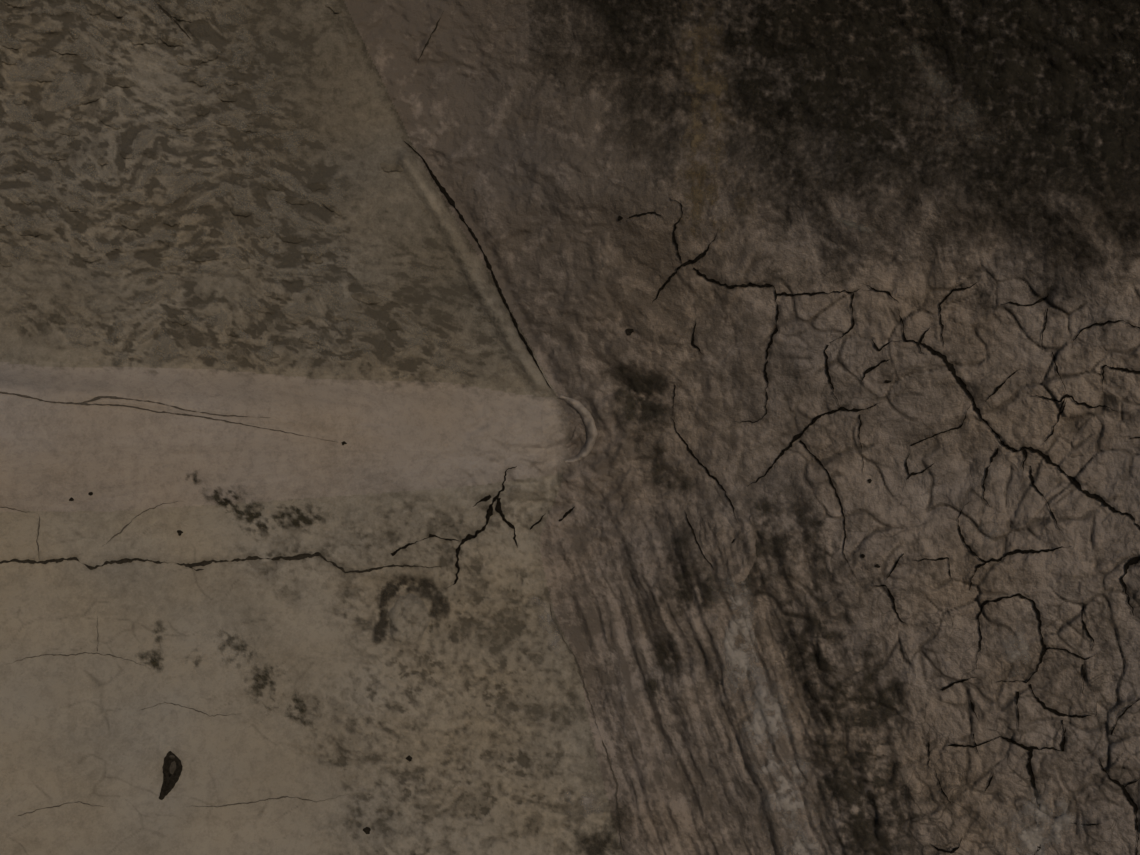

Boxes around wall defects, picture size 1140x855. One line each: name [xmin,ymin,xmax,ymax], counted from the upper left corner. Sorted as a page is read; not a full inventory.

crack [404,141,556,396]
crack [0,391,335,442]
crack [0,466,574,585]
crack [629,195,1140,855]
spalling [159,751,183,800]